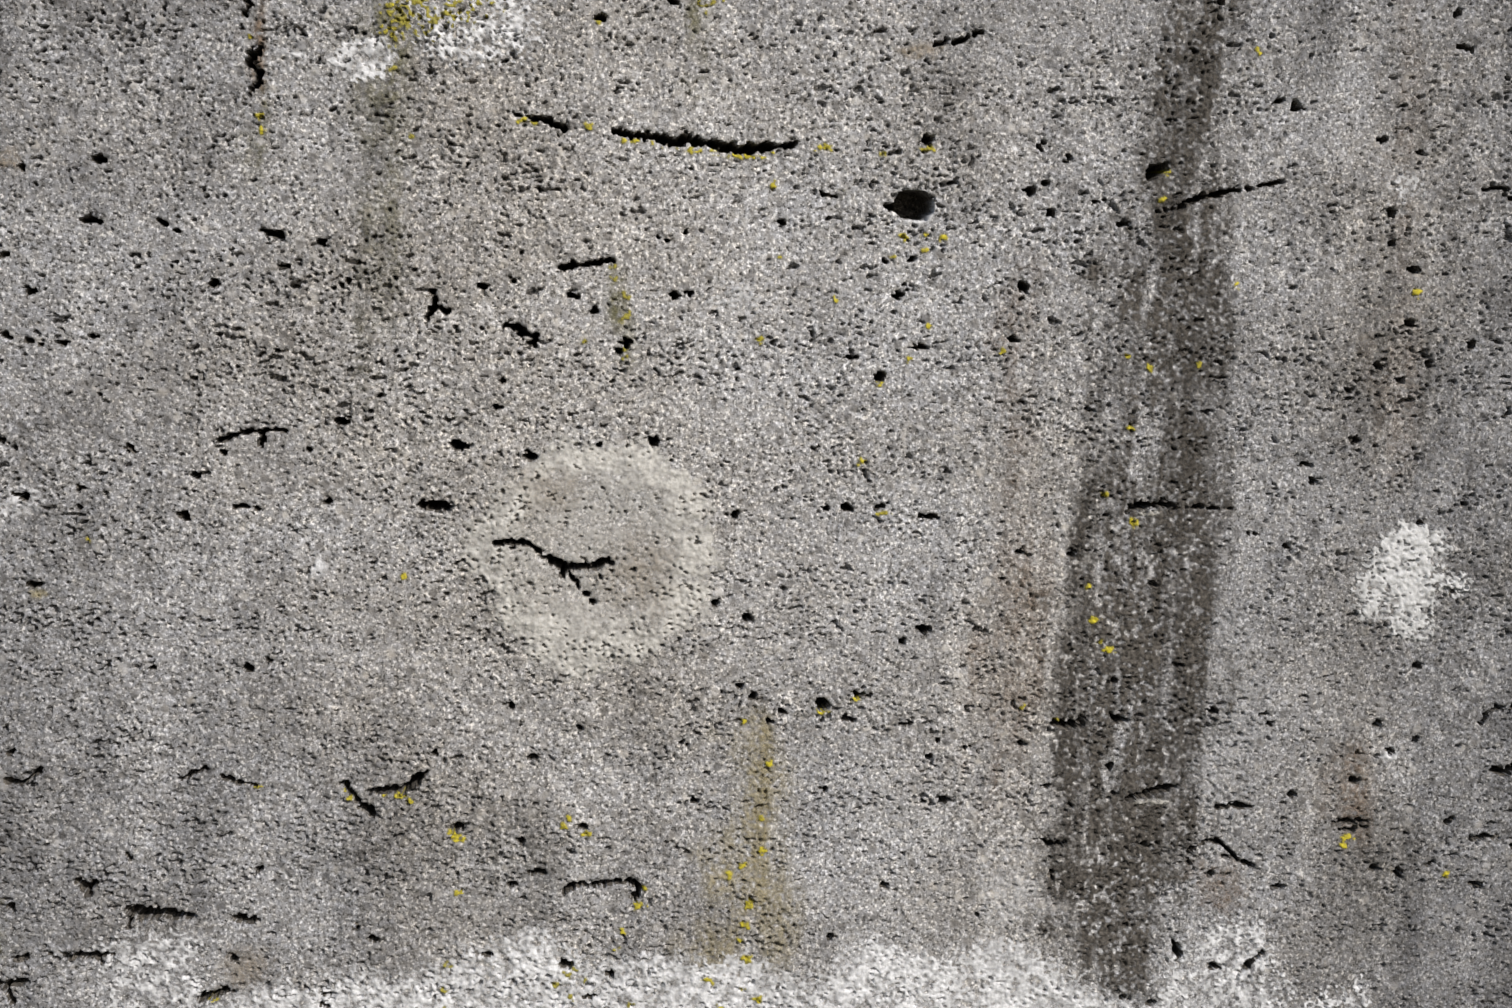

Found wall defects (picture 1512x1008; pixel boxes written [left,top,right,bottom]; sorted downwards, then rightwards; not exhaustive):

crack [512,111,569,134]
crack [611,127,798,155]
damp [1380,173,1427,203]
damp [228,0,1298,1008]
crack [492,537,615,605]
damp [87,923,223,1008]
damp [1304,973,1372,1008]